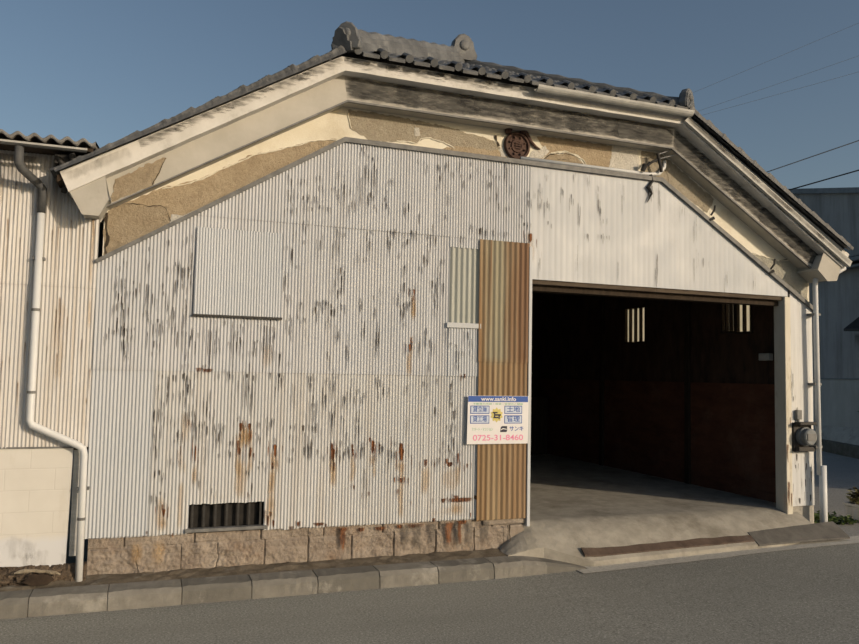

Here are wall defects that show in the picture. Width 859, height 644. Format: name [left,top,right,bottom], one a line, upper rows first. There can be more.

peeling [347,110,510,214]
peeling [530,136,612,167]
peeling [103,139,337,255]
peeling [387,203,437,271]
peeling [305,232,346,321]
rust [237,421,252,459]
rust [394,443,472,486]
rust [441,495,477,503]